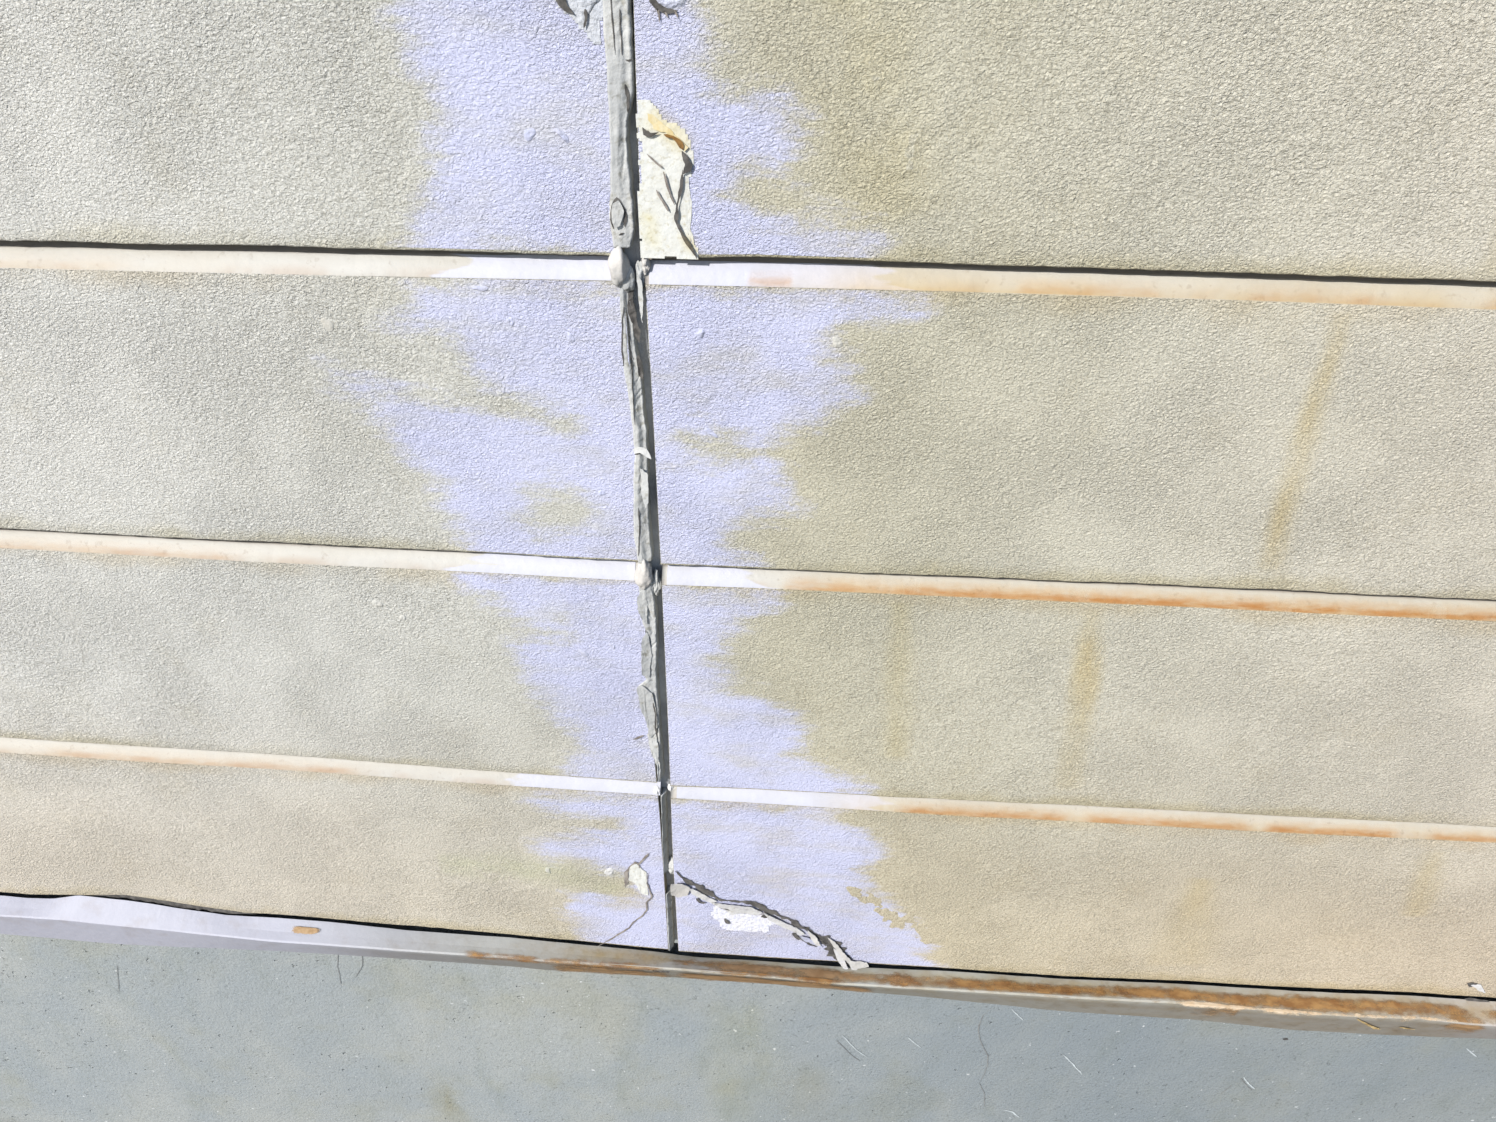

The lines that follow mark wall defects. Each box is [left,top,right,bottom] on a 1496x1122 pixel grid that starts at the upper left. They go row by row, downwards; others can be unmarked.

crack [610,0,678,113]
crack [610,197,627,235]
spalling [636,100,698,260]
crack [621,273,652,556]
crack [651,703,659,739]
rust [470,952,1496,1032]